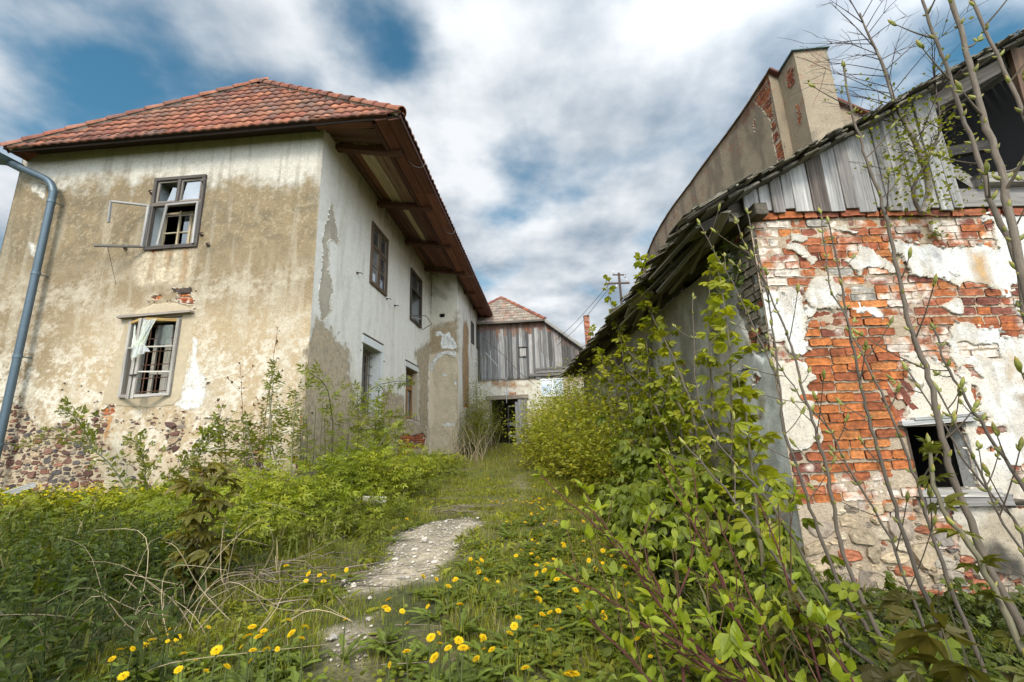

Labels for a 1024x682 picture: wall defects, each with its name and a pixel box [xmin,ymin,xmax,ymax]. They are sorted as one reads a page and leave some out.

leakage [134,249,195,287]
spalling [147,286,197,309]
flaking render [279,200,428,481]
peeling [430,331,457,385]
spalling [724,208,1024,594]